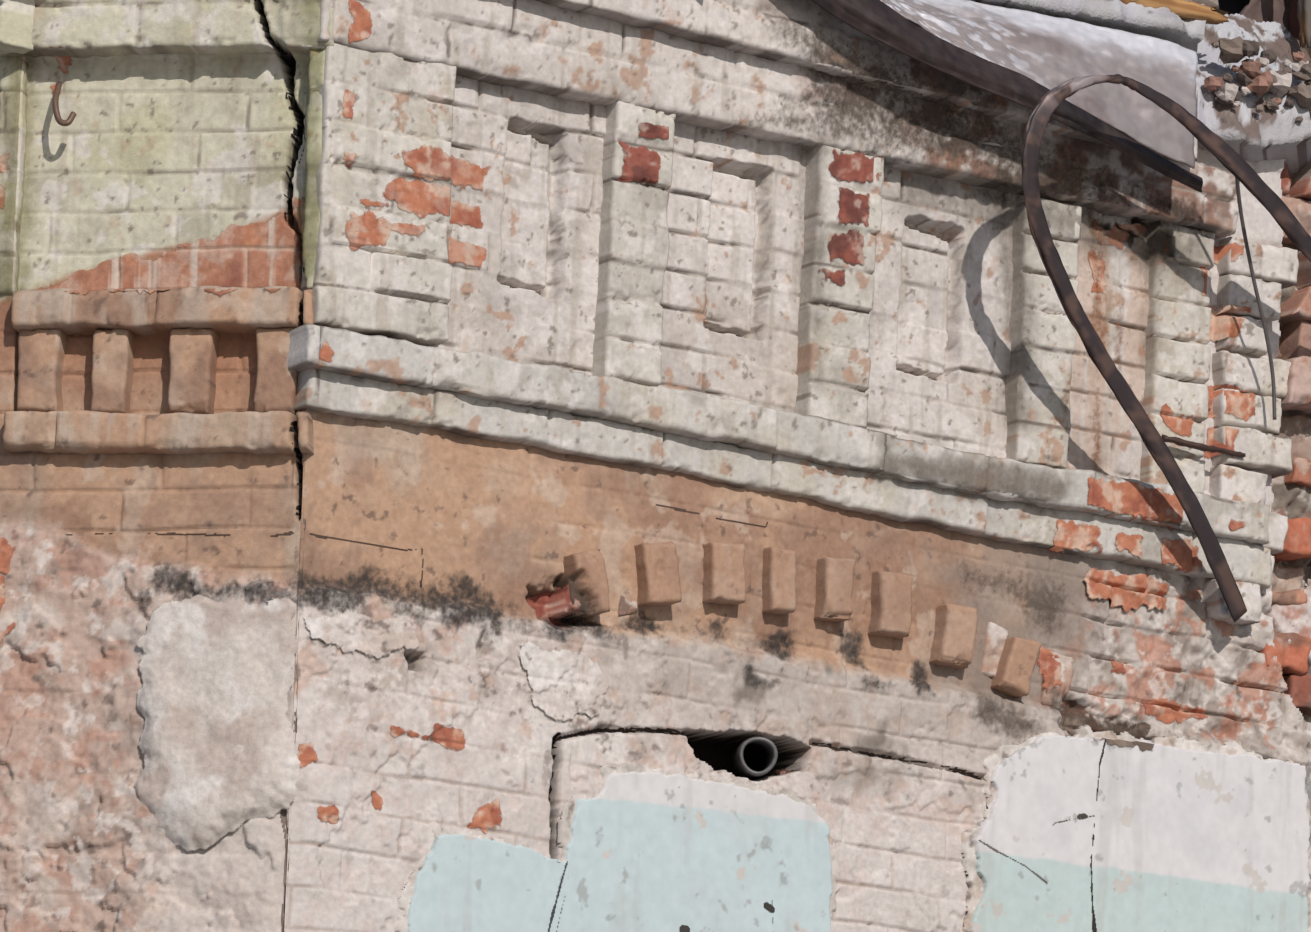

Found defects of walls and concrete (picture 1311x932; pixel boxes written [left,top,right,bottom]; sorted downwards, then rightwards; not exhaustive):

peeling [348,0,373,44]
peeling [342,89,356,119]
crack [254,0,305,324]
peeling [343,152,356,168]
peeling [345,144,491,268]
peeling [37,197,305,296]
peeling [319,341,335,362]
peeling [1049,475,1203,612]
peeling [1229,519,1245,531]
spalling [526,585,581,628]
crack [1053,740,1106,932]
crack [979,840,1048,884]